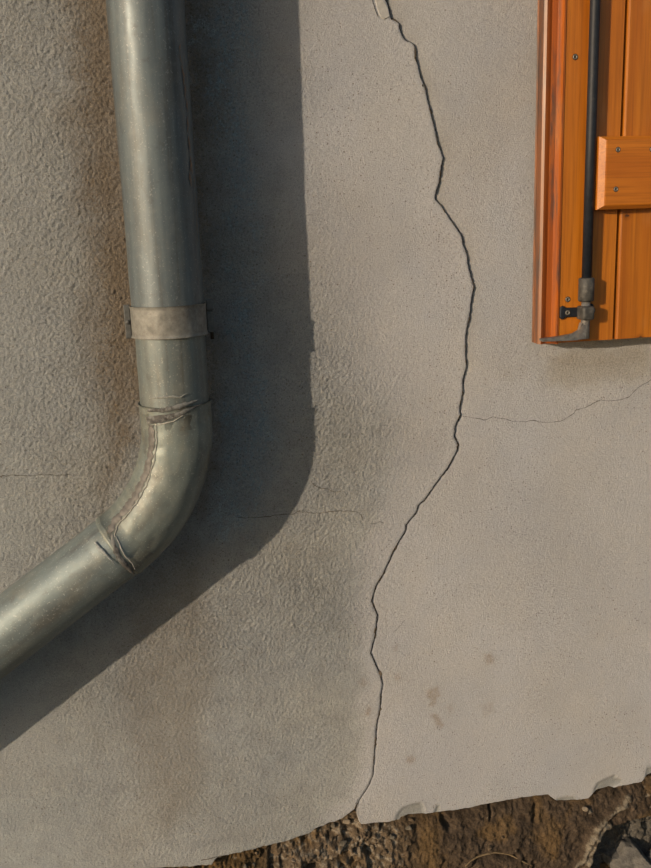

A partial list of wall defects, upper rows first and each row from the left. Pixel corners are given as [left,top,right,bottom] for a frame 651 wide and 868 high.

crack [354,0,649,809]
spalling [591,774,624,795]
spalling [393,800,442,821]